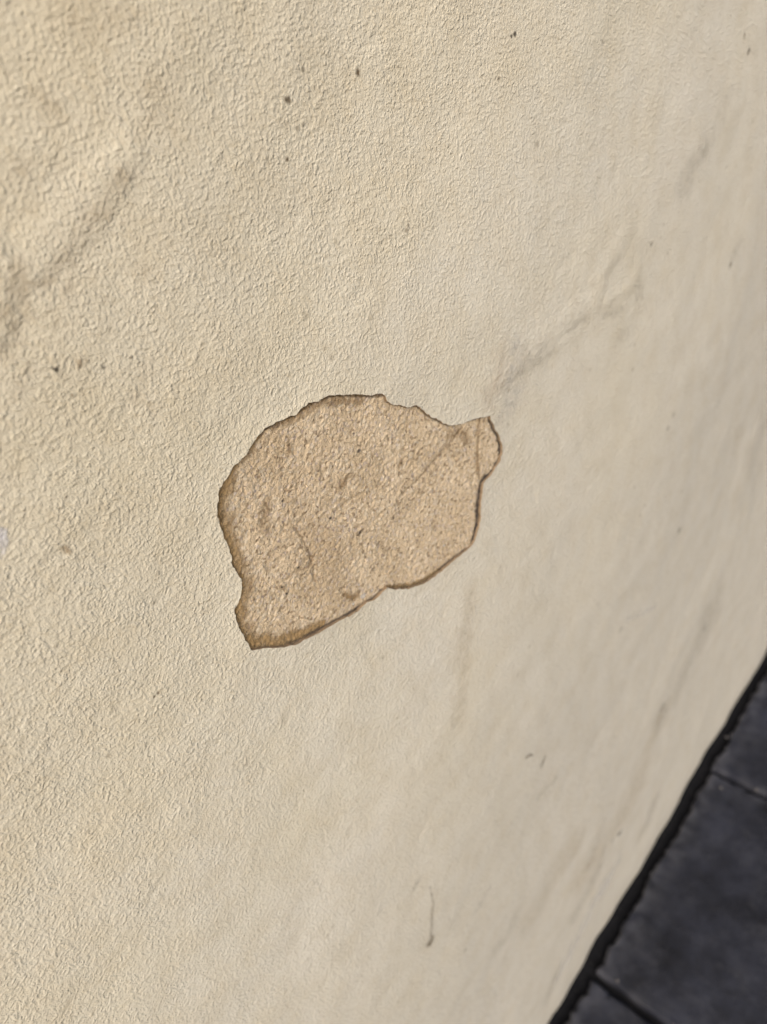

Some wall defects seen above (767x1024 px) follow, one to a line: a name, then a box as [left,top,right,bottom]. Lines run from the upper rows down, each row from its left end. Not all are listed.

peeling [217,394,503,651]